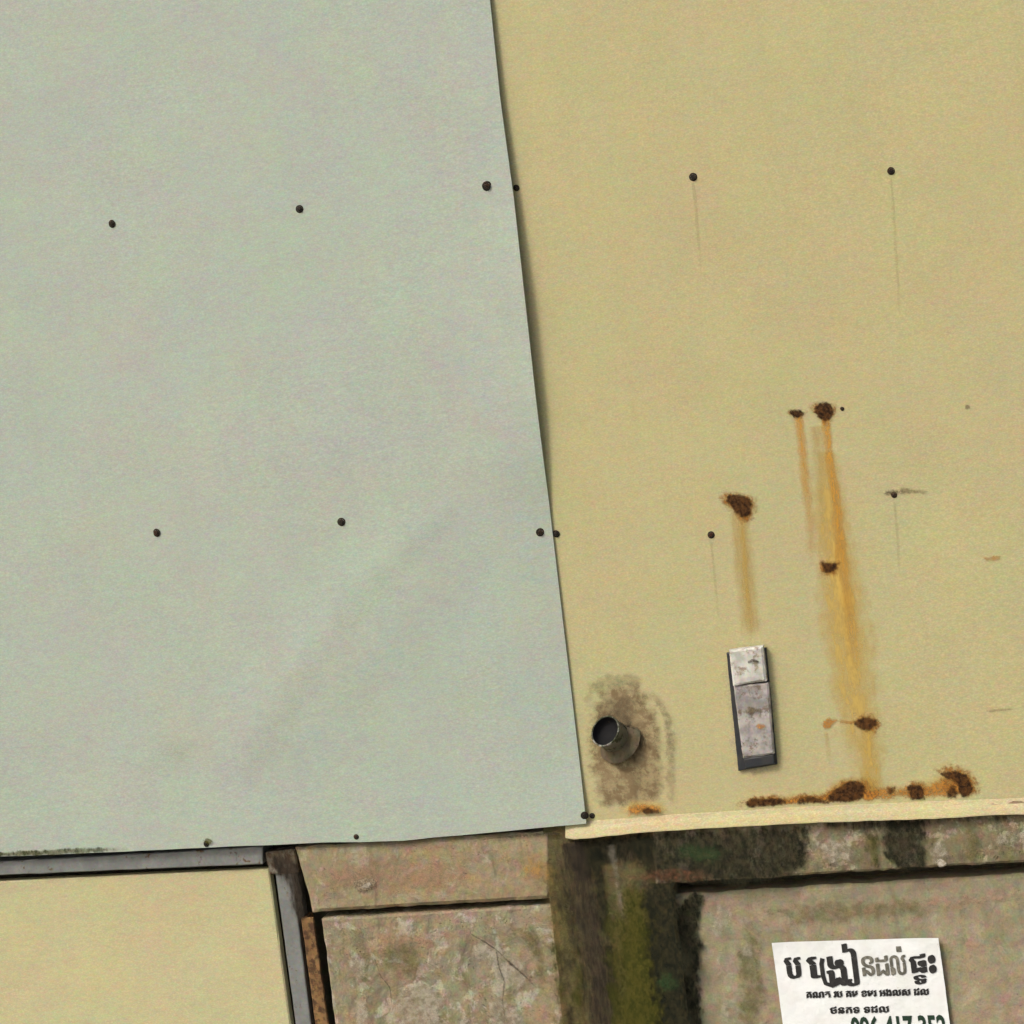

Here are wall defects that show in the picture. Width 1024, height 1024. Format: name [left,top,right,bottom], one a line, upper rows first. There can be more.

corrosion [722,493,754,540]
corrosion [790,402,880,765]
corrosion [628,804,660,814]
corrosion [746,767,976,807]
leakage [525,828,809,1024]